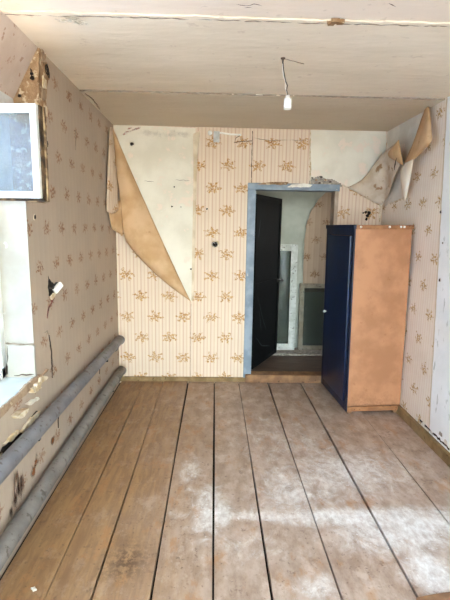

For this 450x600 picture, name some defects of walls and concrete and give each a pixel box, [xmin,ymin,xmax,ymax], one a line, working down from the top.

crack [1,3,450,27]
flaking render [29,48,50,130]
flaking render [259,130,386,187]
flaking render [113,125,196,302]
crack [45,297,55,378]
flaking render [0,369,49,444]